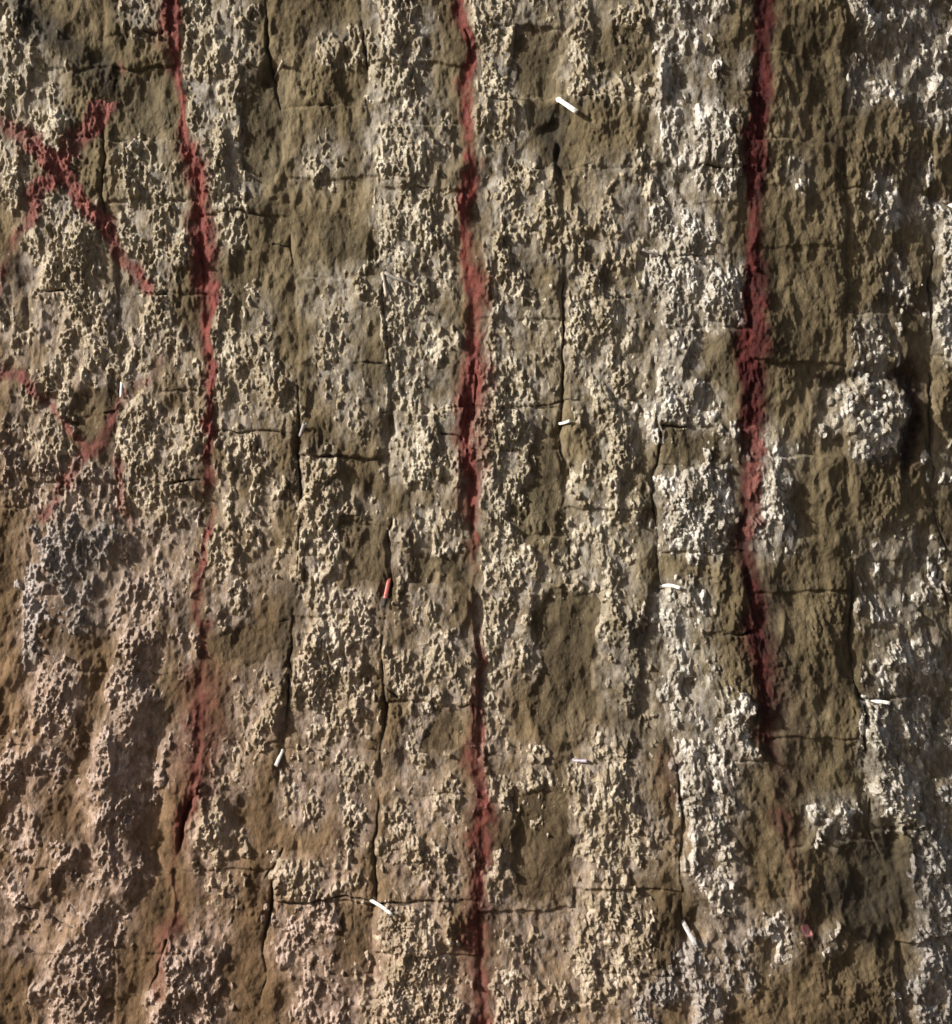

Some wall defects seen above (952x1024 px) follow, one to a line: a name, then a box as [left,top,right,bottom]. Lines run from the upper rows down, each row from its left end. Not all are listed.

crack [363,348,390,369]
crack [275,378,378,564]
crack [385,509,393,603]
crack [651,424,686,595]
crack [280,620,293,729]
crack [372,629,399,763]
crack [466,703,503,757]
crack [262,800,423,951]
crack [671,747,685,915]